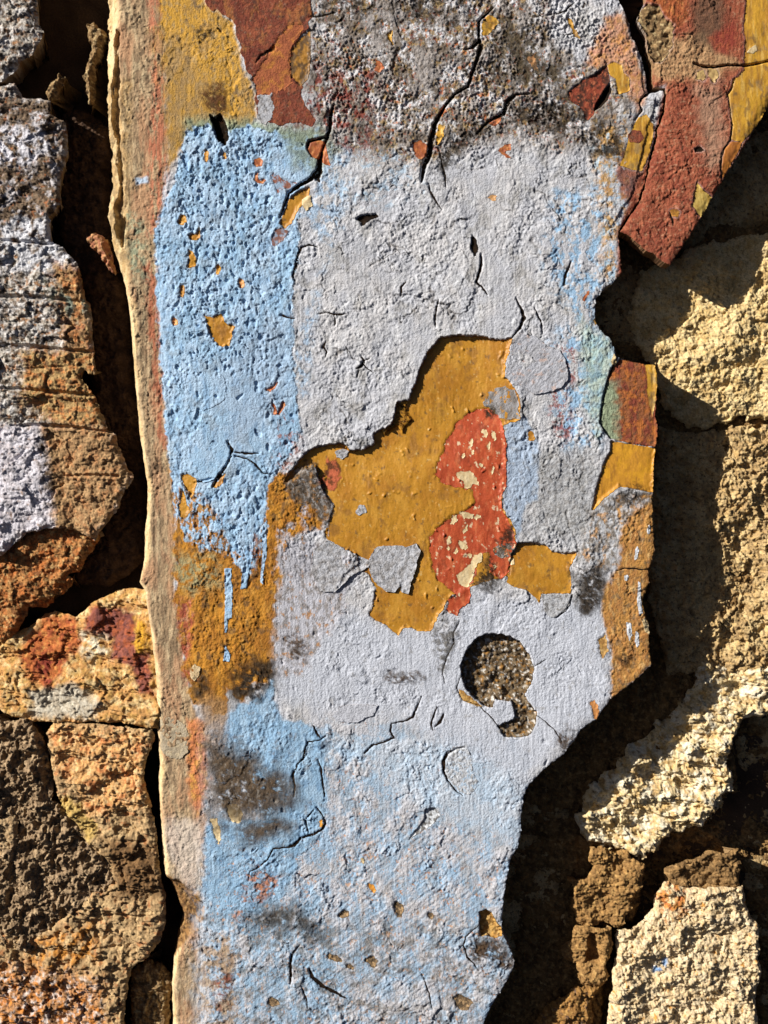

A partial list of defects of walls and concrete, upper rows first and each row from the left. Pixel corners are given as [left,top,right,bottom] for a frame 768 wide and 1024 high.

spalling [211,115,229,159]
peeling [205,0,315,127]
crack [421,10,491,210]
crack [478,94,529,133]
peeling [722,0,768,177]
peeling [254,158,312,246]
peeling [204,314,235,347]
crack [194,442,271,484]
peeling [285,335,576,636]
peeling [593,354,658,510]
spalling [459,634,537,737]
crack [248,725,326,881]